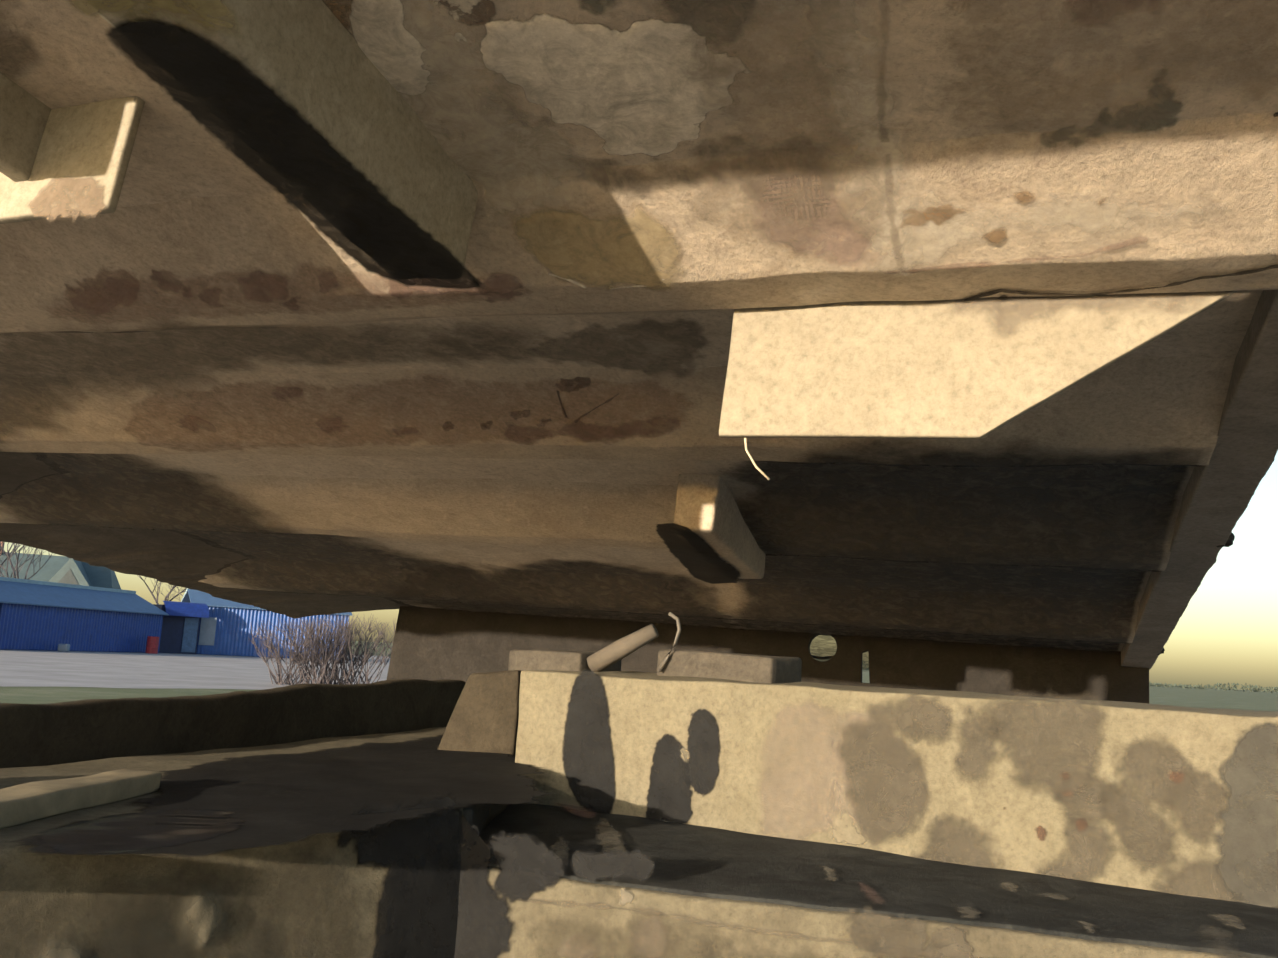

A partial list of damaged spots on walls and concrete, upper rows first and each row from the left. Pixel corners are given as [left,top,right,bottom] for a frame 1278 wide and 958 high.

peeling [349,0,438,95]
peeling [430,0,750,156]
water stain [581,0,615,14]
water stain [684,0,921,271]
water stain [1044,70,1182,145]
crack [964,264,1278,301]
water stain [0,327,521,434]
water stain [0,443,1198,670]
water stain [15,735,655,958]
water stain [562,670,615,814]
water stain [646,709,720,824]
water stain [762,695,1278,908]